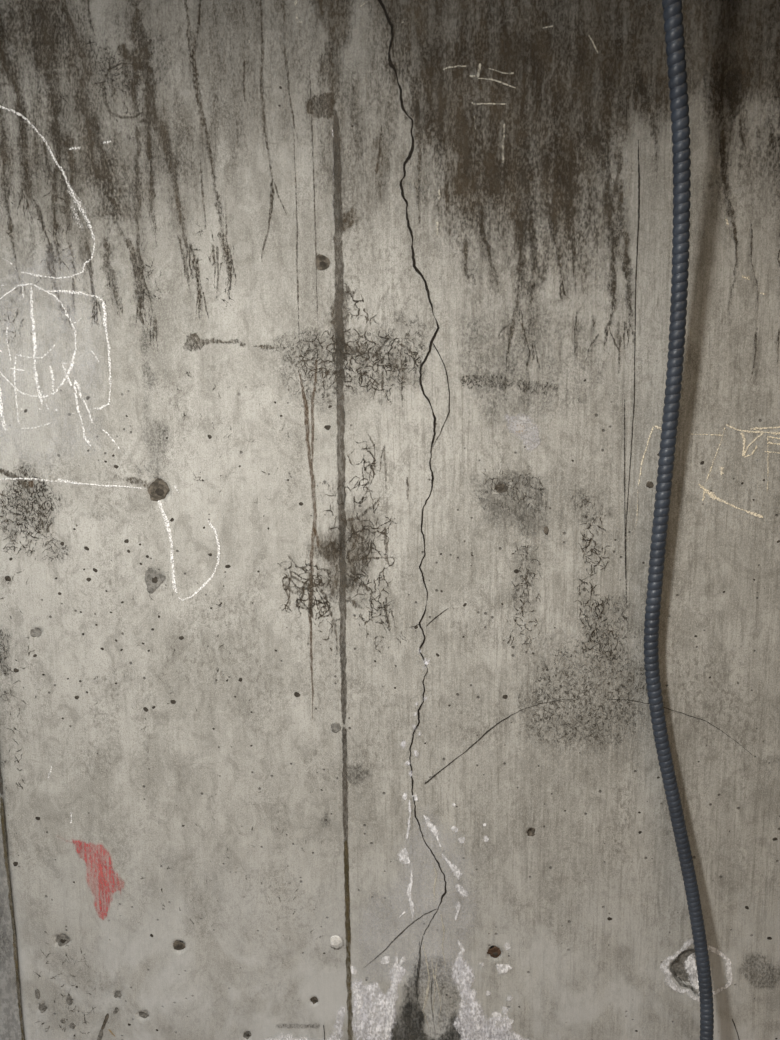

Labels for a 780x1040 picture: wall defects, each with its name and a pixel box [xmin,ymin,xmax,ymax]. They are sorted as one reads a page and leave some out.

leakage [0,0,236,347]
leakage [256,1,268,149]
leakage [261,167,298,263]
leakage [374,0,669,368]
leakage [682,0,780,275]
leakage [277,283,424,410]
mould [278,438,402,653]
crack [365,0,570,993]
leakage [329,793,523,1040]
spalling [660,938,699,1002]
spalling [708,946,732,995]